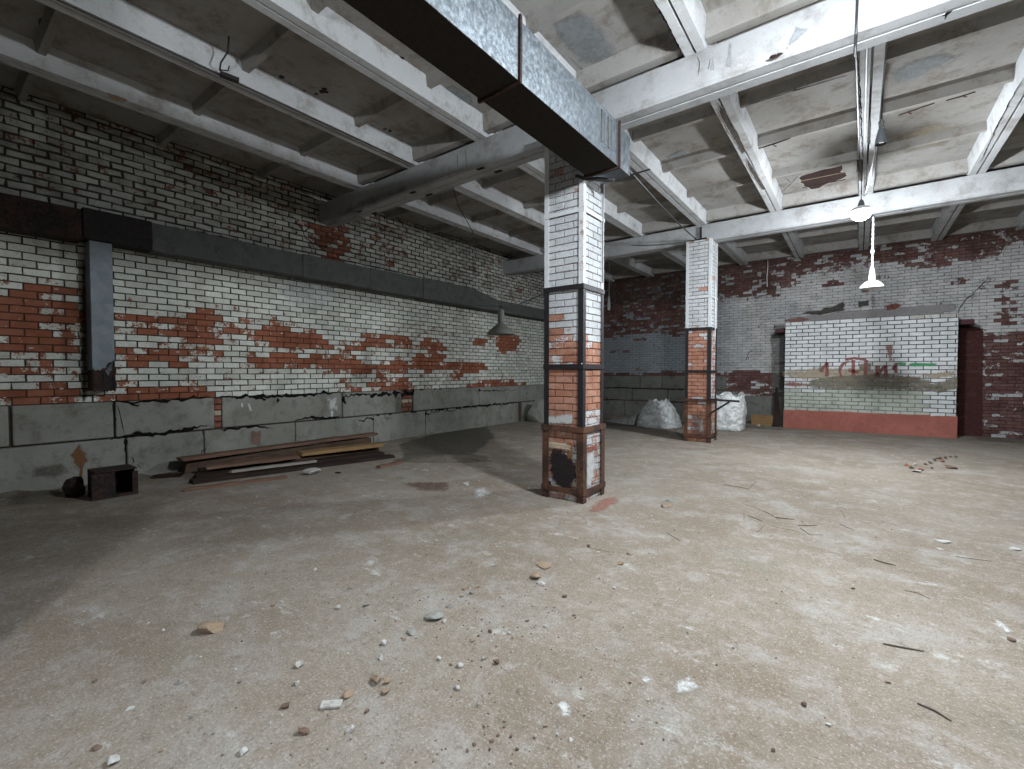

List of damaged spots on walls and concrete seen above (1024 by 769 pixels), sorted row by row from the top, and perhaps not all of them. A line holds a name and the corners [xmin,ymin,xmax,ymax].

spalling [798,158,866,190]
peeling [315,224,355,262]
peeling [717,232,989,299]
peeling [0,283,83,353]
peeling [0,367,87,405]
peeling [114,308,223,368]
peeling [239,321,526,392]
peeling [541,270,784,396]
peeling [982,280,1024,439]
crack [110,388,517,468]